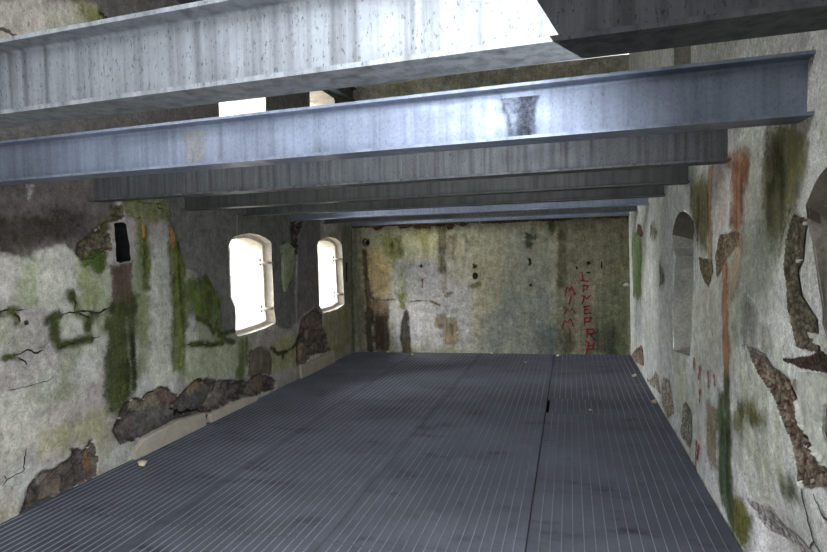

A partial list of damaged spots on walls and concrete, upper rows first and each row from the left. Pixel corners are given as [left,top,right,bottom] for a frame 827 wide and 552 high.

crack [0,27,17,36]
leakage [110,262,137,314]
leakage [362,249,411,353]
spalling [699,231,742,286]
rust [721,149,748,395]
spalling [112,374,276,445]
spalling [19,439,98,514]